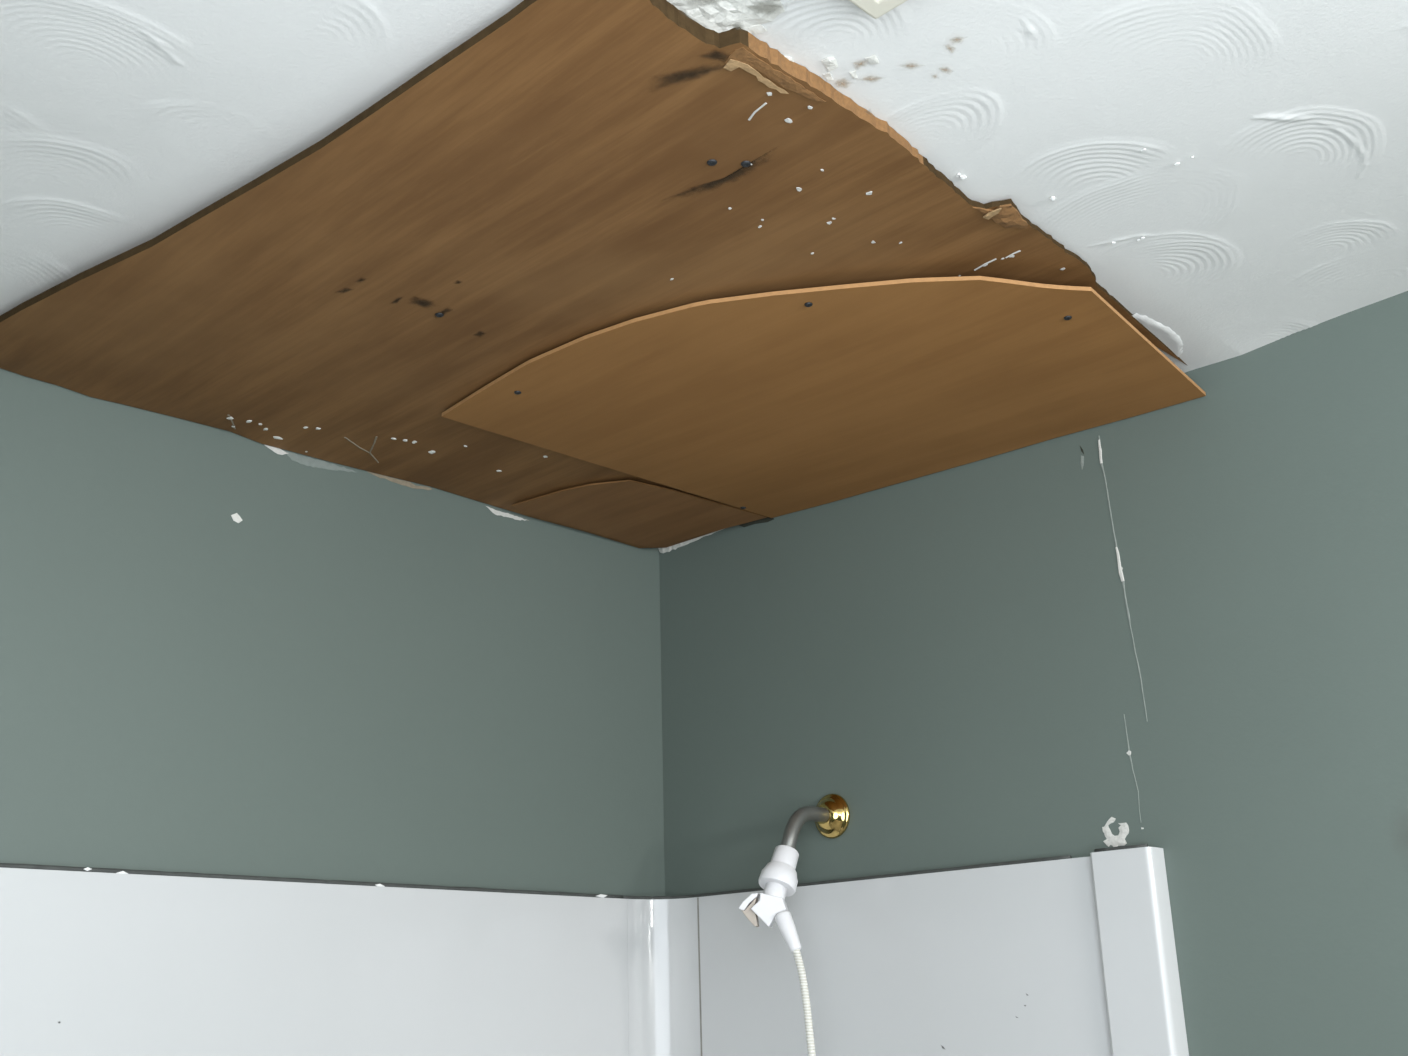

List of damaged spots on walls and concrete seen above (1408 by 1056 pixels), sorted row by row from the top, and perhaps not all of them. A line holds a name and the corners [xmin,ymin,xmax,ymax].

flaking render [667,0,784,34]
peeling [226,415,435,490]
peeling [486,506,525,521]
flaking render [658,529,723,553]
crack [1098,436,1147,829]